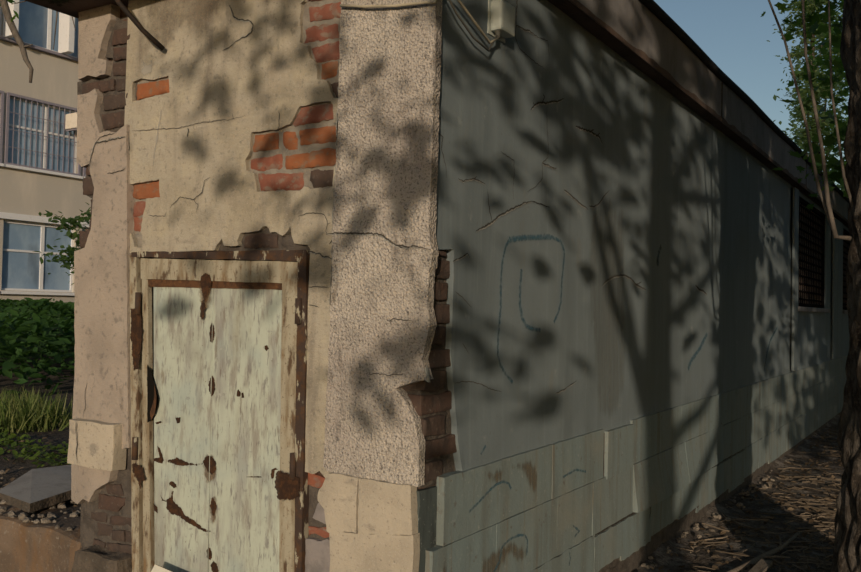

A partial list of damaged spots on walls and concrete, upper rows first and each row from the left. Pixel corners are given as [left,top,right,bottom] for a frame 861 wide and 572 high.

crack [224,5,253,50]
flaking render [77,18,170,132]
flaking render [249,0,341,192]
crack [88,115,245,174]
crack [300,78,431,310]
crack [439,130,555,232]
flaking render [218,227,310,251]
rust [130,309,143,370]
spalling [403,251,457,488]
rust [154,447,216,481]
rust [153,481,217,532]
rust [250,468,300,501]